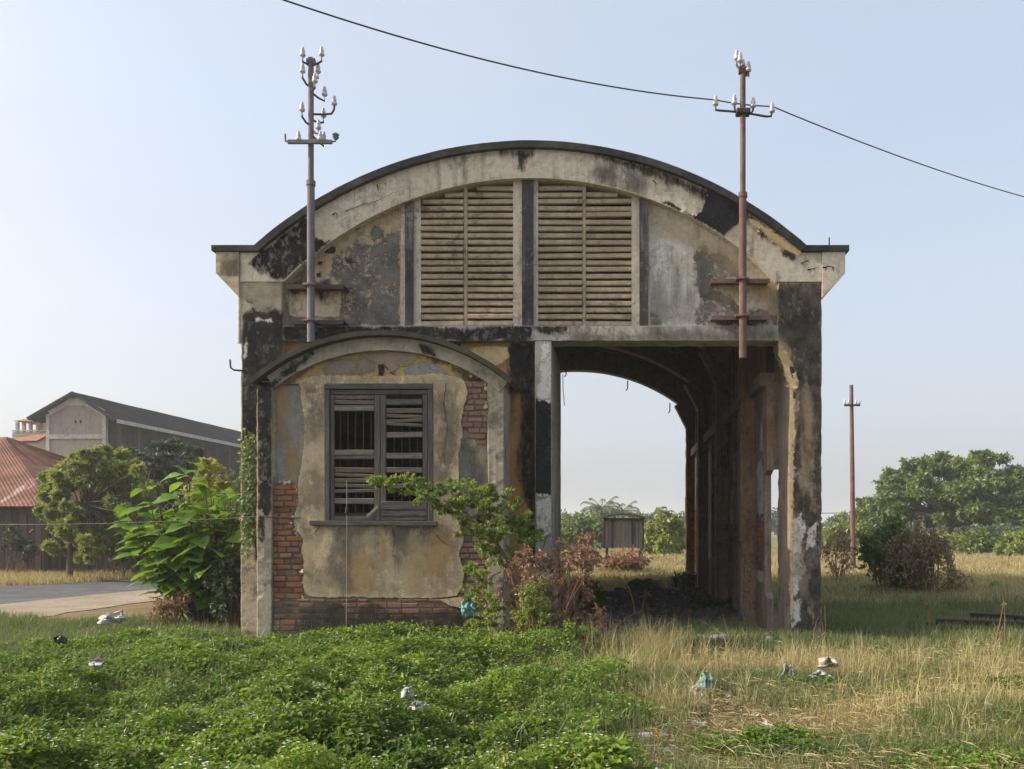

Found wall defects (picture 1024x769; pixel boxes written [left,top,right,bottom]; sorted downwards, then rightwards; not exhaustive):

damp [594,157,709,200]
flaking render [273,402,304,599]
peeling [321,351,449,376]
flaking render [440,521,487,608]
flaking render [461,375,488,445]
damp [222,212,821,636]
peeling [536,342,551,537]
spalling [778,344,819,628]